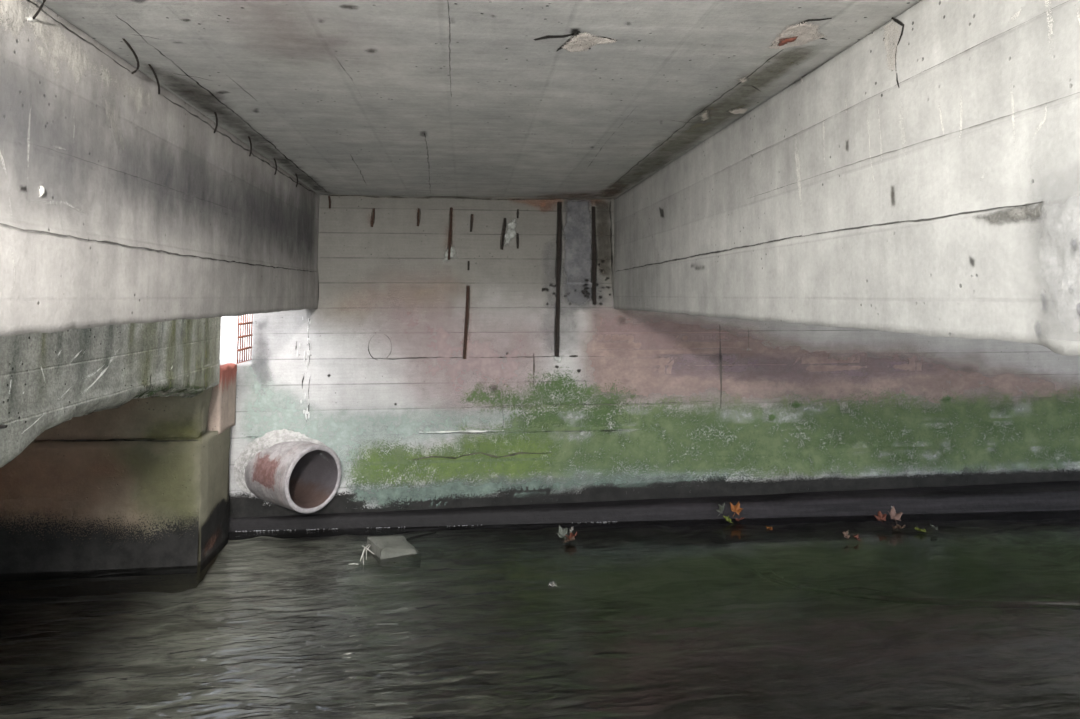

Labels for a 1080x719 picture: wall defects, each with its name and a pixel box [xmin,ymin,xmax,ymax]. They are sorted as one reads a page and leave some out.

crack [27,0,129,71]
spalling [533,29,617,52]
spalling [769,18,832,49]
damp [0,75,82,184]
damp [169,76,322,190]
crack [119,17,1043,274]
crack [0,223,319,299]
damp [119,147,312,254]
spalling [983,202,1043,223]
damp [168,319,209,393]
damp [246,367,512,467]
damp [0,464,1080,582]